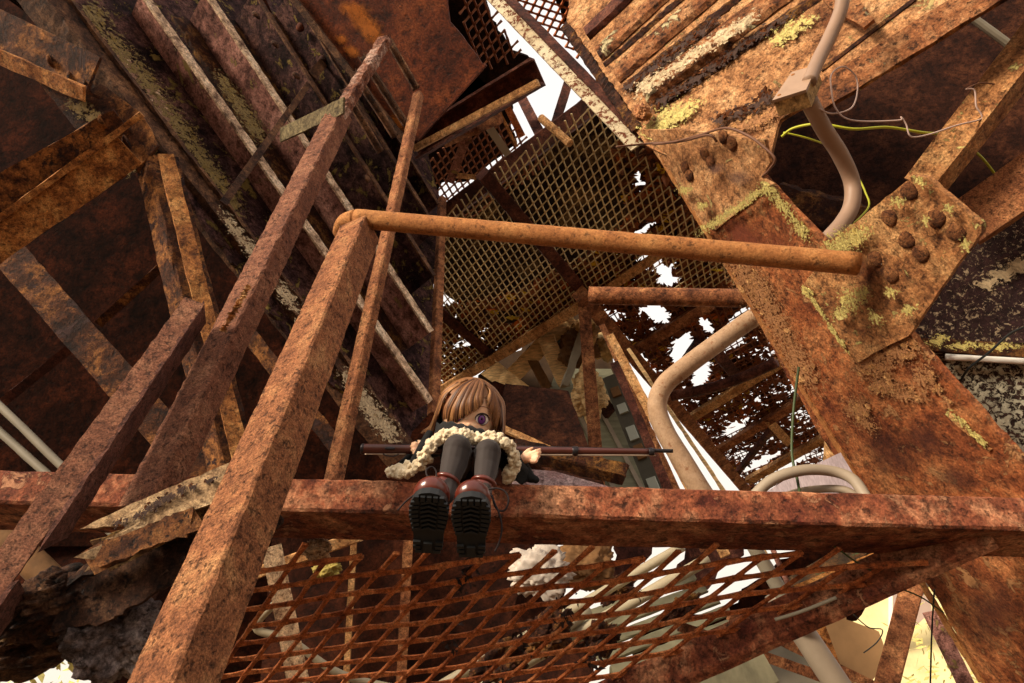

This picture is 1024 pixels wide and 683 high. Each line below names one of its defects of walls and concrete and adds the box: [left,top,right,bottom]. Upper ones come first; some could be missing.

corrosion [623,16,722,93]
peeling [625,7,761,100]
peeling [77,0,256,259]
corrosion [728,104,782,134]
peeling [921,203,955,228]
peeling [276,279,301,322]
peeling [973,251,1024,291]
peeling [721,263,1024,449]
corrosion [40,507,203,586]
corrosion [613,546,652,577]
corrosion [220,562,286,683]
corrosion [269,537,571,683]